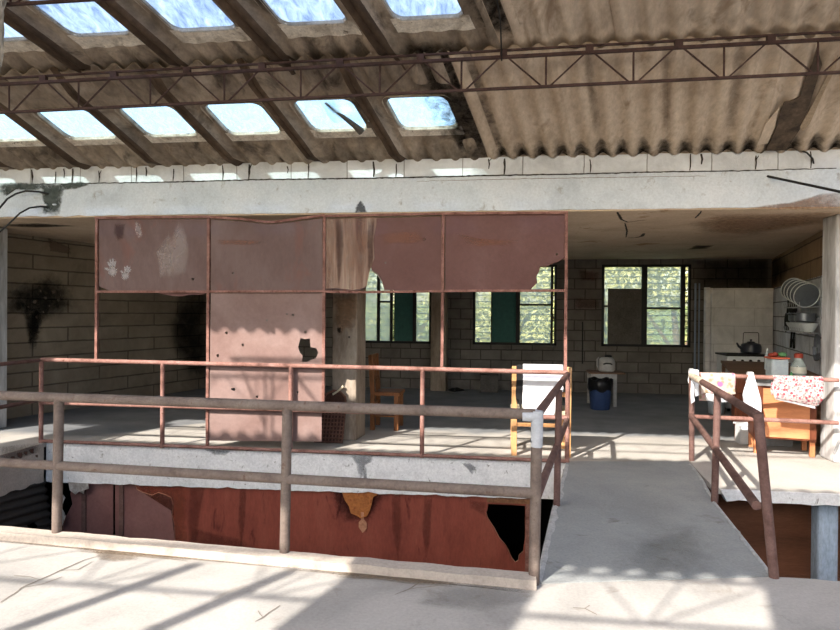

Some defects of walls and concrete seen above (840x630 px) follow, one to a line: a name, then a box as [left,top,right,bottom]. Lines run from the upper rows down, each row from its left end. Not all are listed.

water stain [409,43,485,149]
peeling [757,106,780,145]
peeling [800,56,838,131]
water stain [0,182,87,214]
crack [617,212,645,238]
water stain [25,311,38,342]
corrosion [136,485,281,550]
corrosion [290,491,526,572]